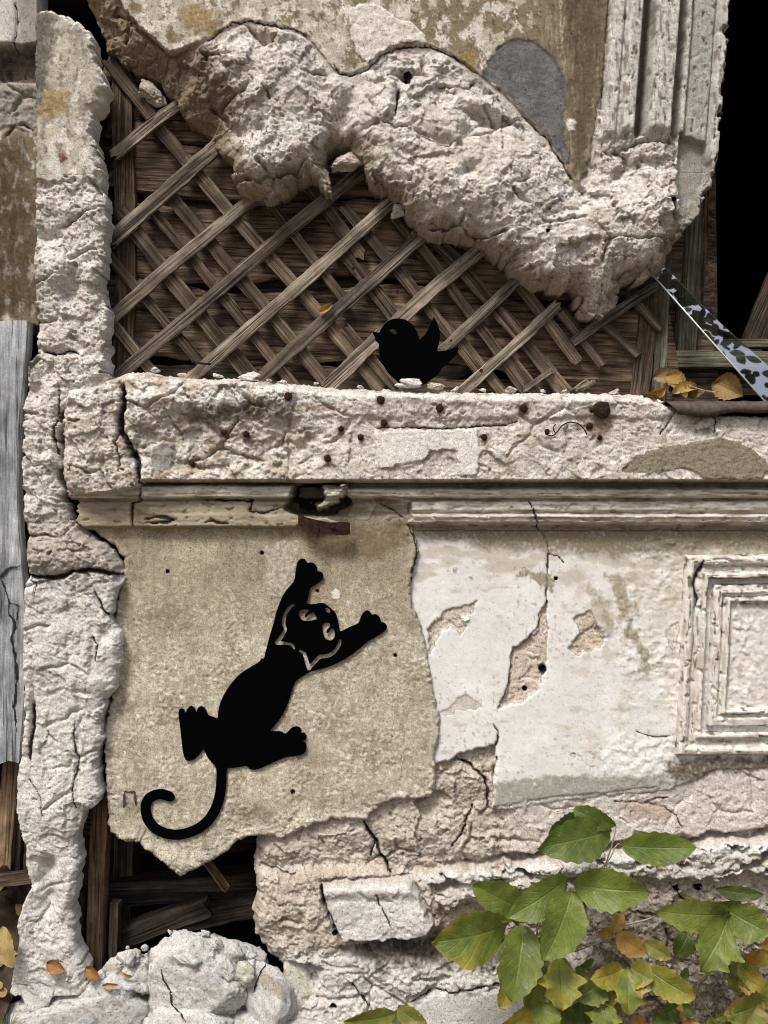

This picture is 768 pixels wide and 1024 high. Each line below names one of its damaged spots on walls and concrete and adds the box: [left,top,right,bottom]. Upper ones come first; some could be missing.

crack [52,389,61,455]
spalling [427,601,477,653]
spalling [499,602,548,709]
crack [452,501,682,846]
spalling [568,610,605,656]
crack [364,821,392,874]